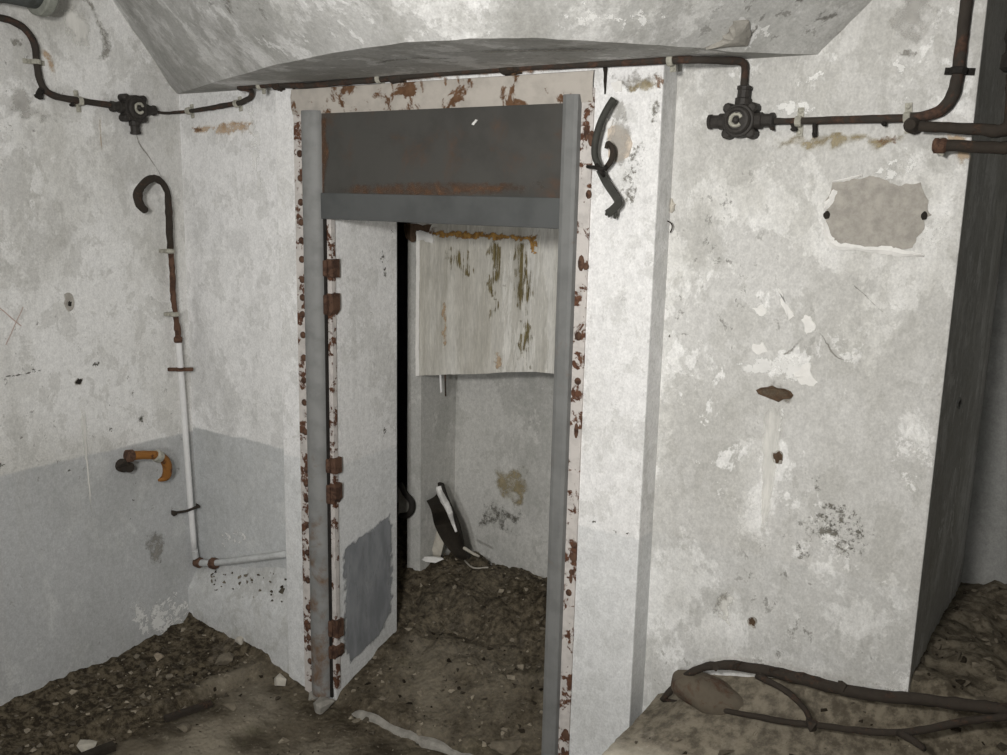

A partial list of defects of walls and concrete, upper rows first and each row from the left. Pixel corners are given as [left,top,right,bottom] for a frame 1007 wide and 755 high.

corrosion [584,124,594,146]
peeling [823,157,949,257]
corrosion [578,255,589,271]
peeling [778,288,816,334]
peeling [736,342,818,402]
leakage [812,504,874,554]